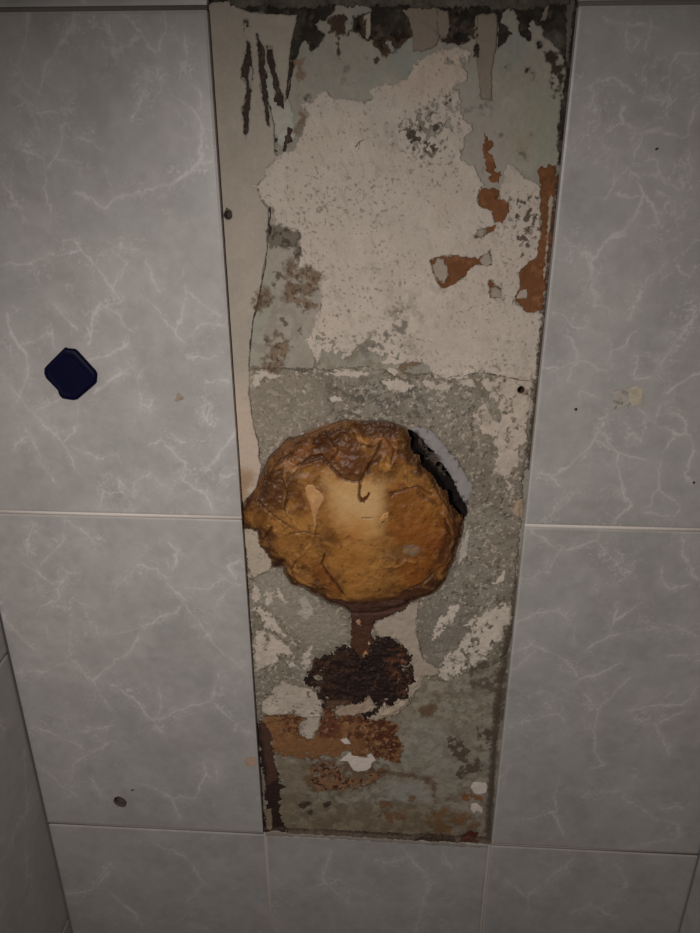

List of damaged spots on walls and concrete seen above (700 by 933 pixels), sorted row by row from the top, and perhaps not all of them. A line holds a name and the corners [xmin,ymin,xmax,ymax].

peeling [208,1,566,503]
peeling [305,485,325,527]
peeling [244,528,313,670]
corrosion [260,708,404,792]
peeling [260,602,507,837]